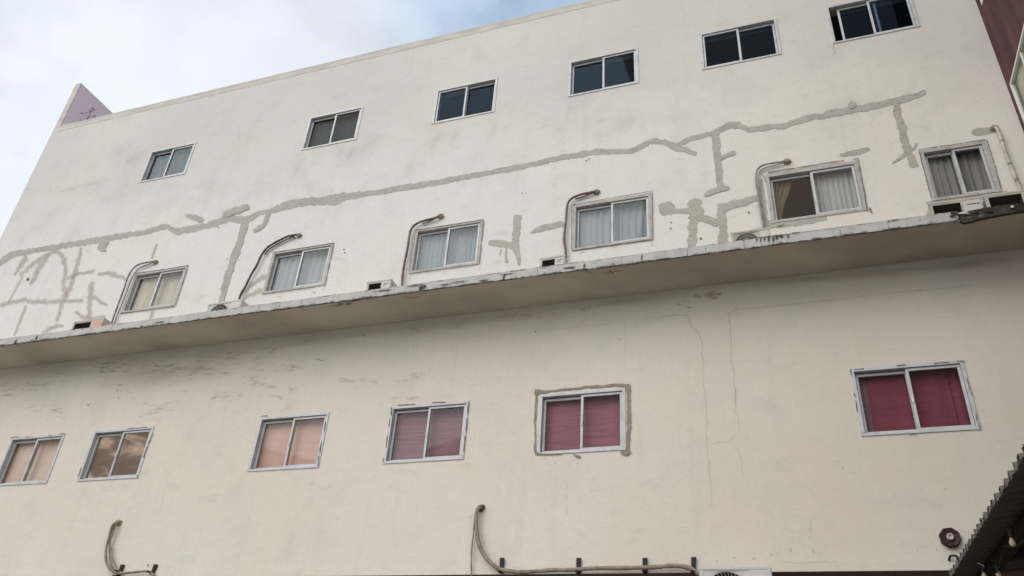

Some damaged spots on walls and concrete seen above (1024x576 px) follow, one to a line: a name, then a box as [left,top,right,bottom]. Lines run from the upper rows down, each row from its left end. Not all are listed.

spalling [950,202,1024,225]